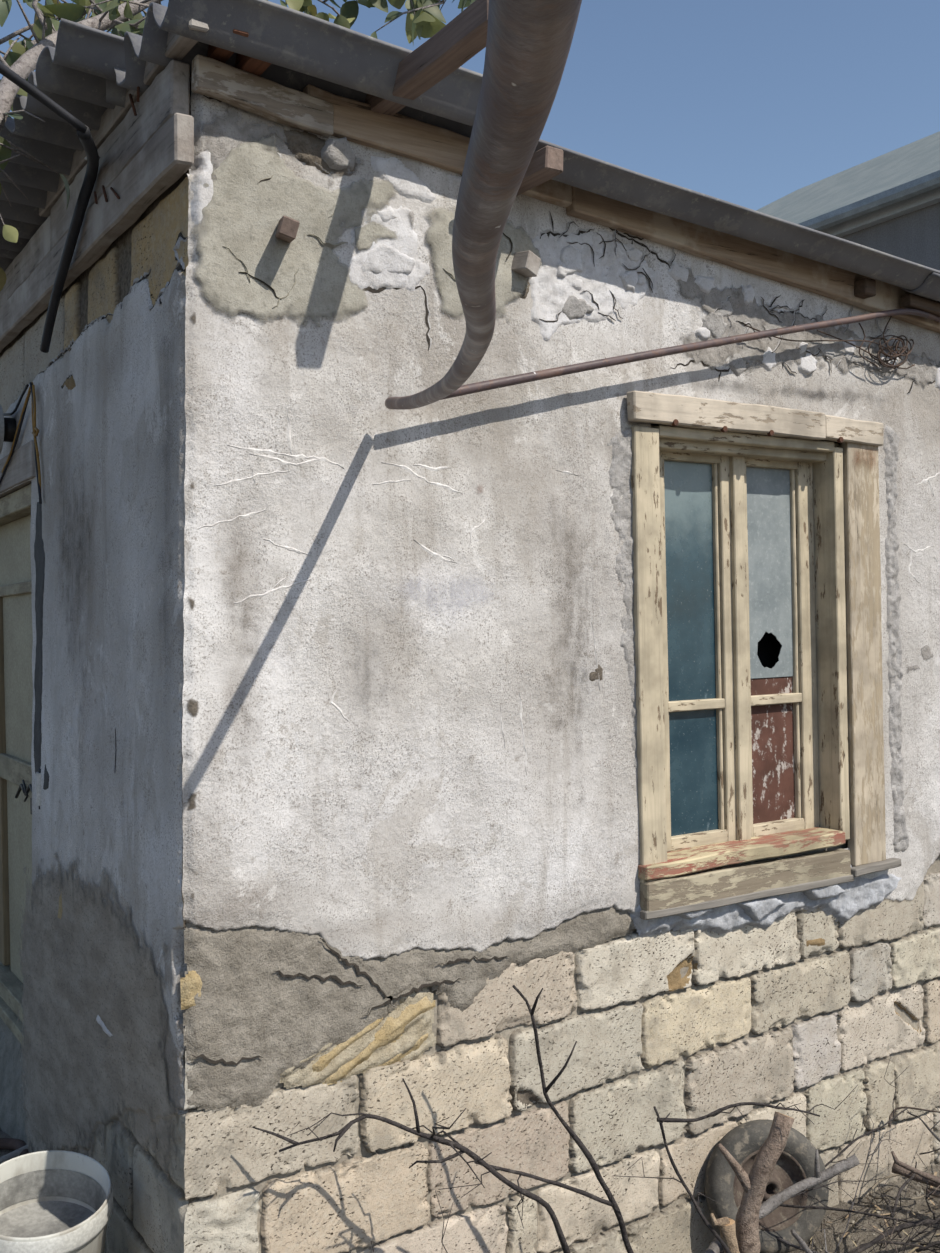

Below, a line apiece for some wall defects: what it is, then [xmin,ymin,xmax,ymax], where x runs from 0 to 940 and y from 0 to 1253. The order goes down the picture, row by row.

peeling [187,106,437,291]
crack [540,211,671,268]
peeling [520,221,940,390]
leakage [34,502,49,790]
spalling [607,429,638,784]